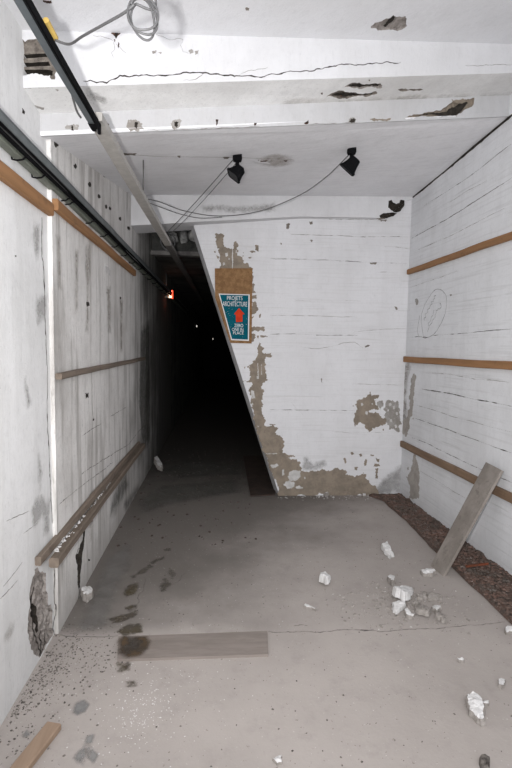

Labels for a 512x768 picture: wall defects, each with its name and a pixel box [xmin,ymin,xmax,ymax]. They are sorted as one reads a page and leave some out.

spalling [371,15,407,31]
spalling [23,39,58,91]
crack [85,61,398,84]
spalling [321,80,382,99]
spalling [408,98,474,119]
peeling [214,233,380,500]
peeling [353,373,416,437]
peeling [406,453,420,499]
crack [75,531,85,598]
spalling [28,567,53,658]
damp [110,548,171,635]